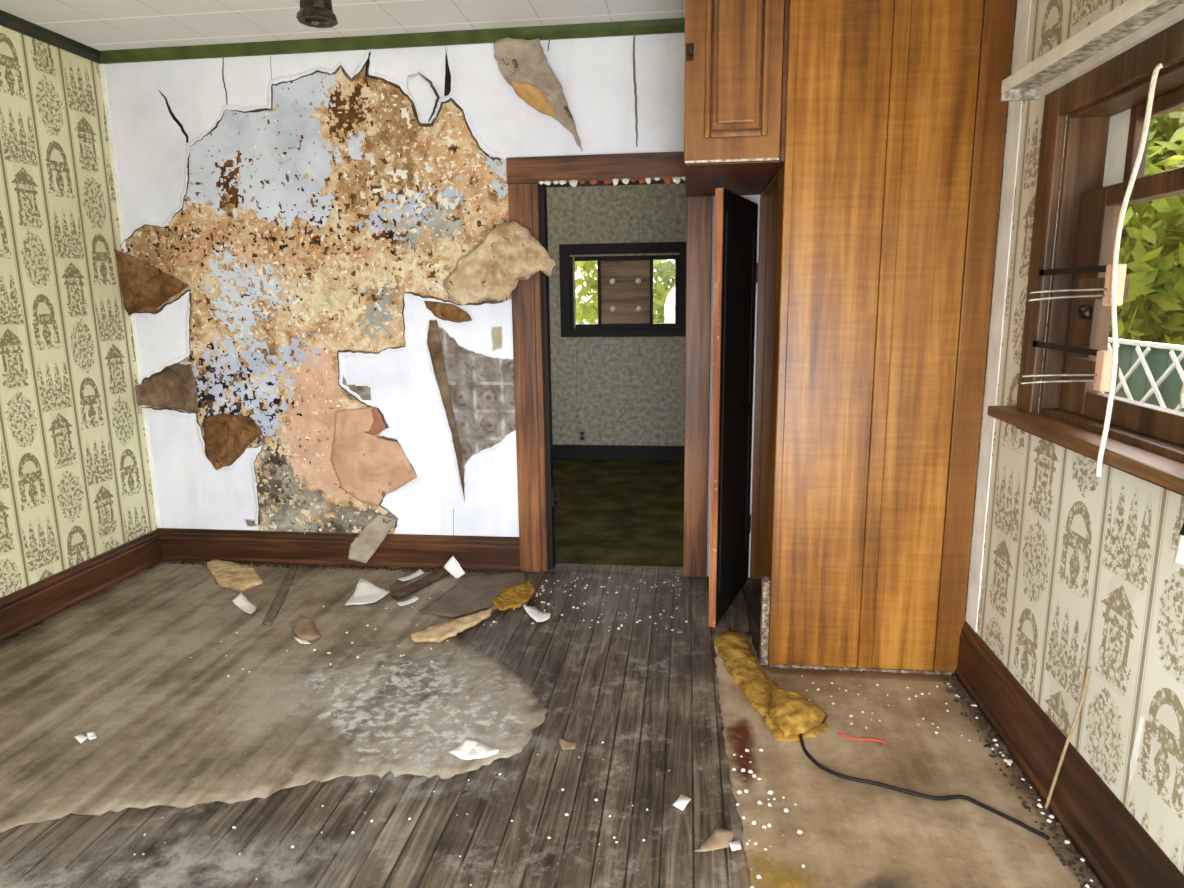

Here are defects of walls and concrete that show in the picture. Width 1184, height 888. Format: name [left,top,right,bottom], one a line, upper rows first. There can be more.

crack [158,90,188,143]
peeling [494,37,583,152]
crack [631,35,639,147]
peeling [114,49,556,535]